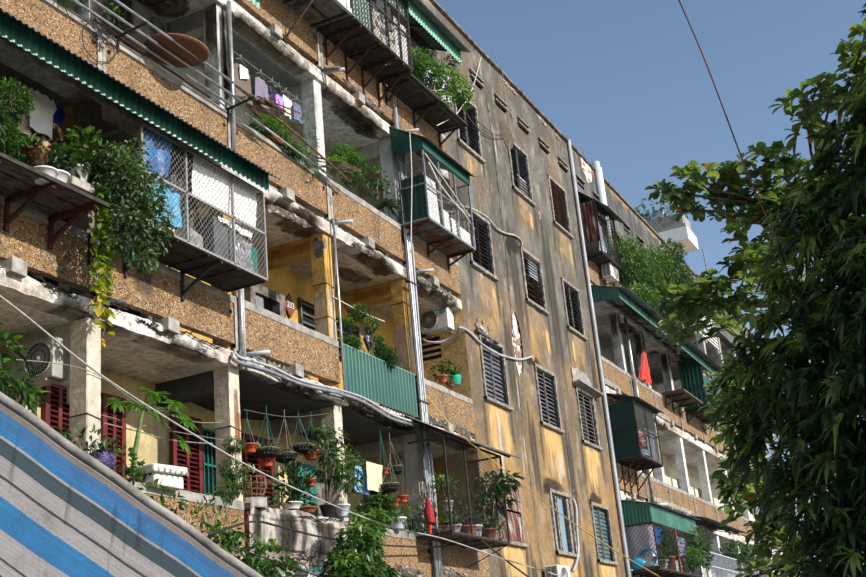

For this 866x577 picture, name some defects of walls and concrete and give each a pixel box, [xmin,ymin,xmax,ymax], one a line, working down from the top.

flaking render [512,311,524,376]
leakage [484,403,515,471]
leakage [527,403,604,511]
leakage [499,547,537,577]
leakage [555,544,619,577]